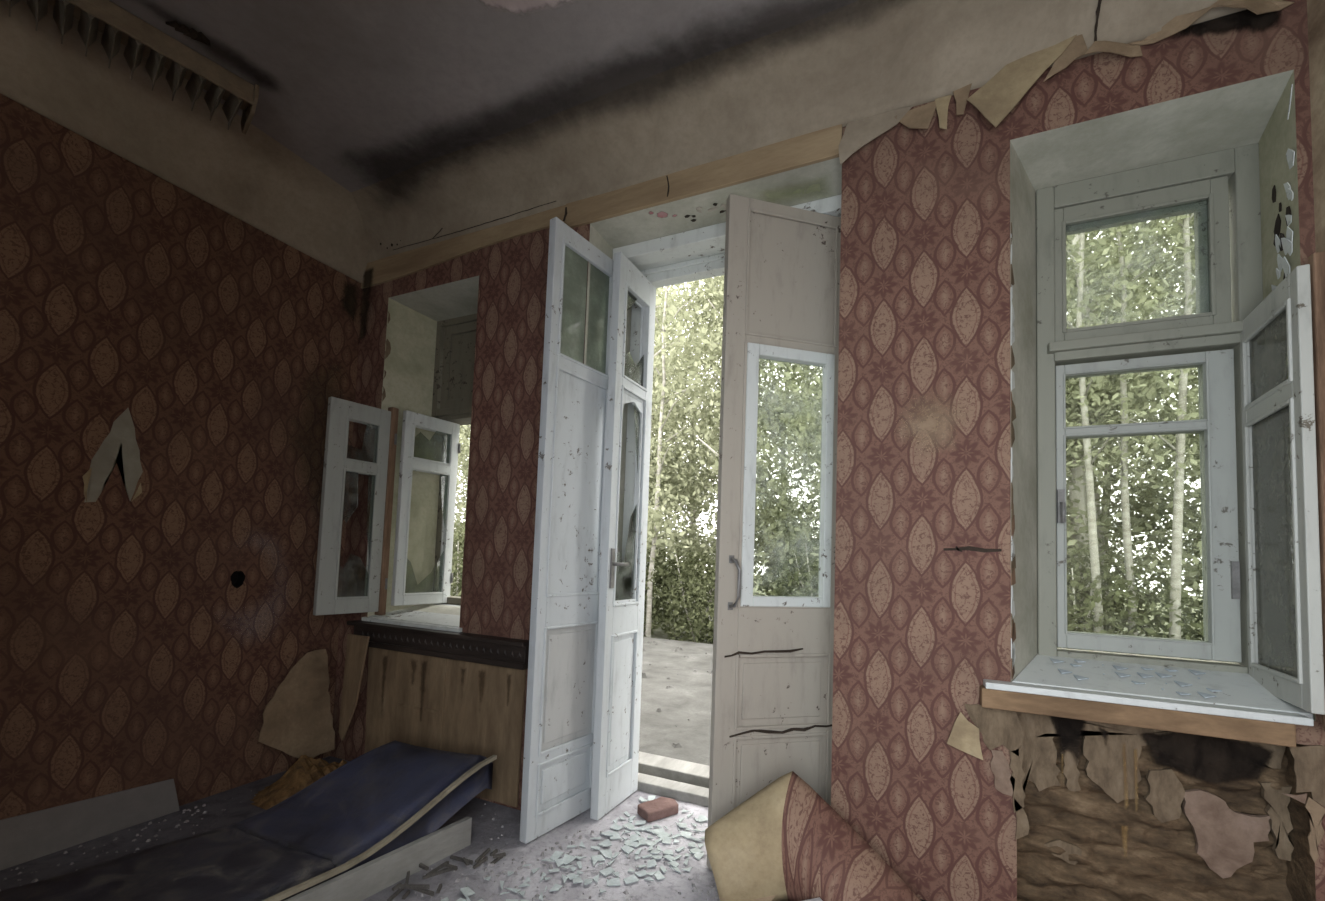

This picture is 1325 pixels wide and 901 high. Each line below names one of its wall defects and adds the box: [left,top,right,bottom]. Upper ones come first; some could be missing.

peeling [165,21,210,46]
peeling [1044,0,1294,81]
damp [353,0,892,196]
peeling [839,83,972,165]
peeling [82,408,143,502]
spalling [965,704,1325,901]